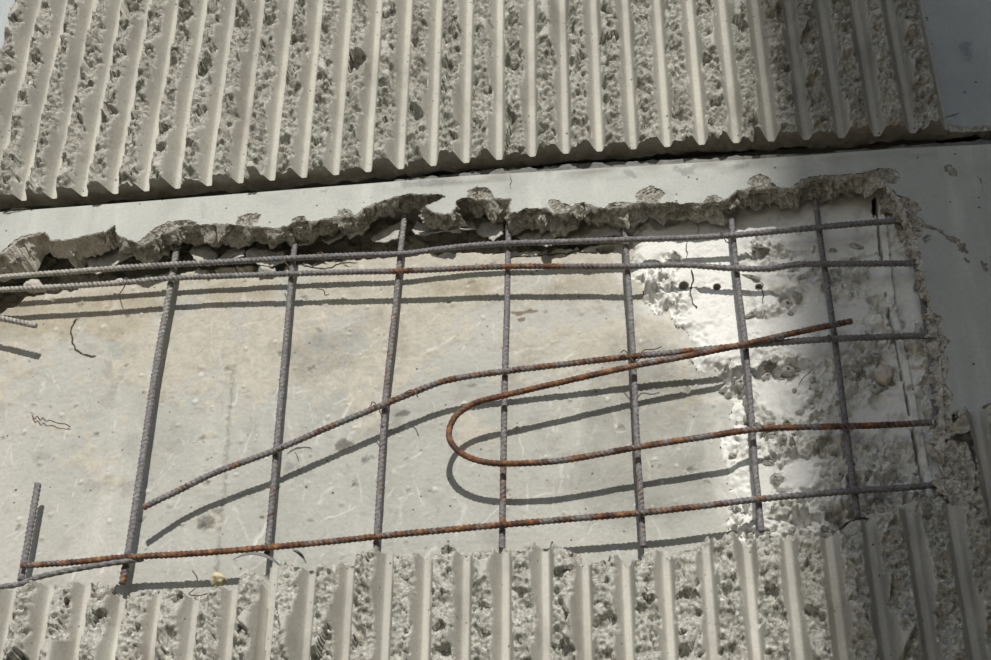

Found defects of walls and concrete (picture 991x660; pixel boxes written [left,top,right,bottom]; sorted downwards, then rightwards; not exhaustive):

spalling [0,168,976,512]